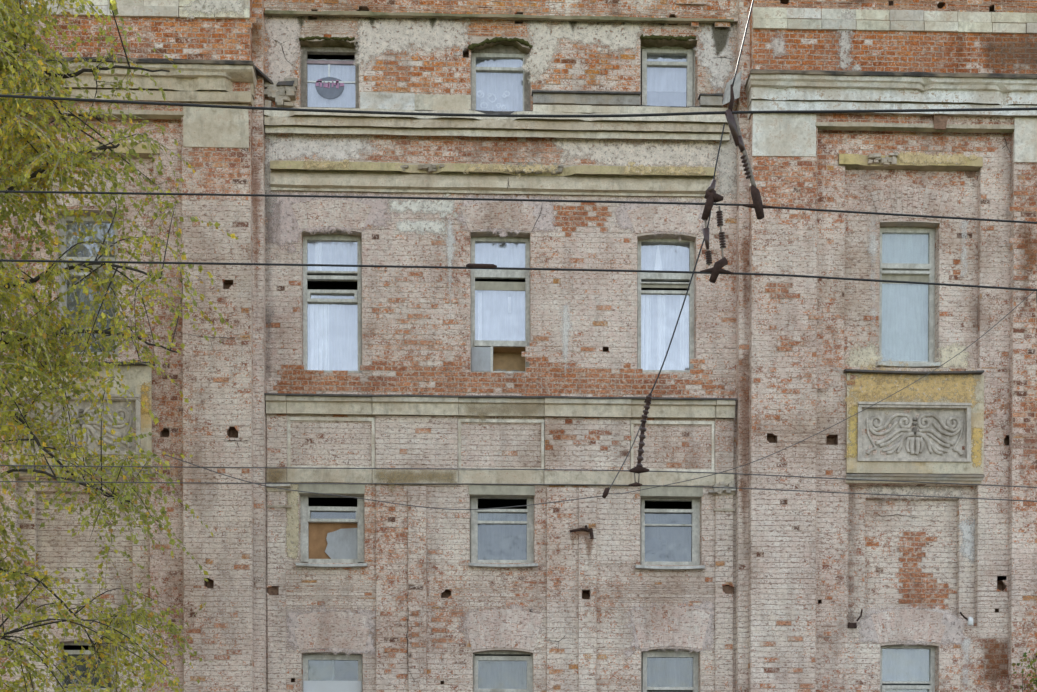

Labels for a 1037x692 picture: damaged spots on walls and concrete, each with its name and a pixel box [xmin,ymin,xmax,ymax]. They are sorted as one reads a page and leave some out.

flaking render [358,50,461,93]
flaking render [545,46,623,85]
flaking render [549,202,612,237]
flaking render [273,267,736,397]
flaking render [895,531,957,609]